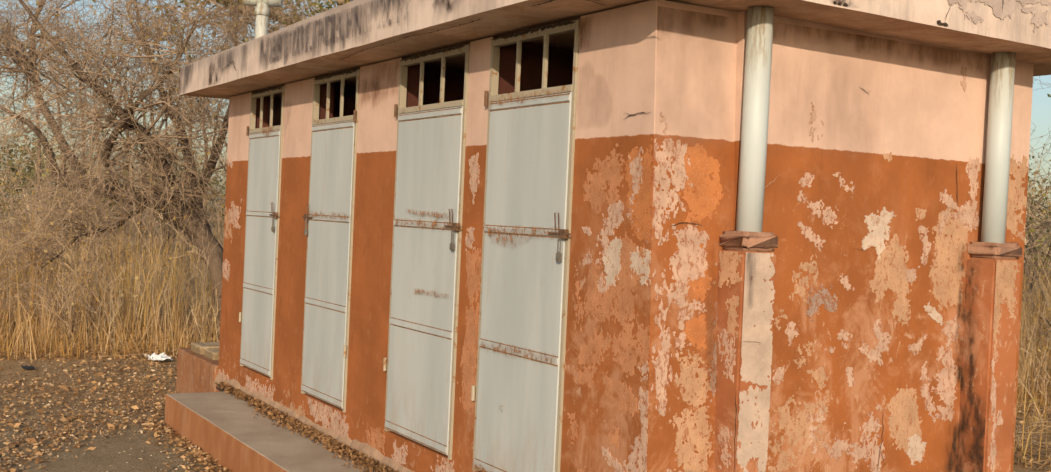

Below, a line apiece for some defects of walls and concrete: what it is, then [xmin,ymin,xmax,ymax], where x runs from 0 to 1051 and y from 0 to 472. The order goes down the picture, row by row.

water stain [260,5,358,64]
peeling [948,0,1051,32]
water stain [209,45,245,84]
peeling [469,153,480,204]
rust [395,209,451,229]
peeling [573,112,981,472]
water stain [948,263,986,472]